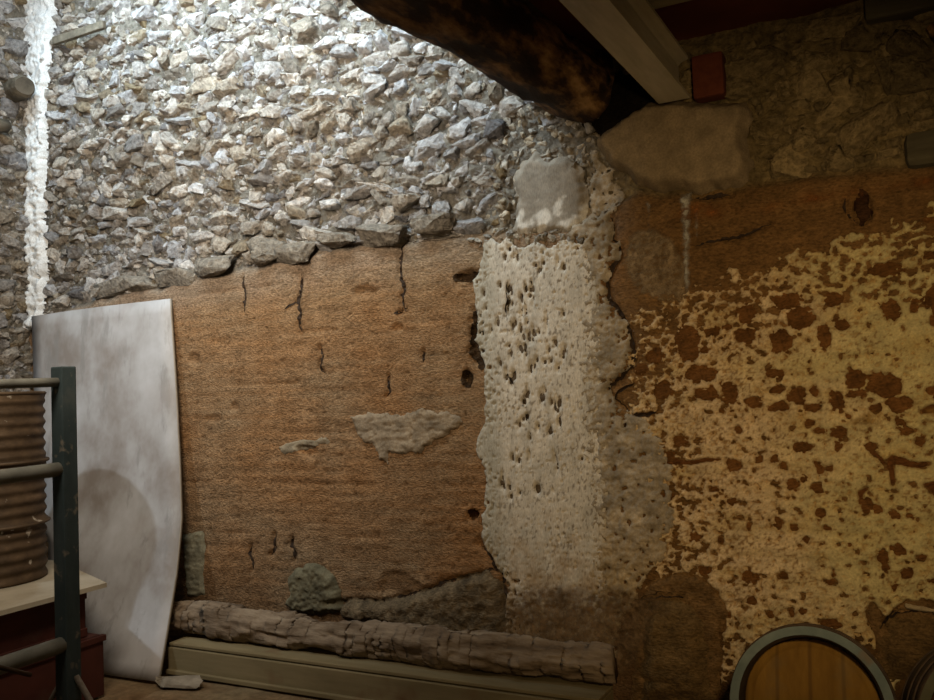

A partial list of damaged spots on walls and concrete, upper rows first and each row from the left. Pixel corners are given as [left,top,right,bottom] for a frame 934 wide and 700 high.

damp [627,193,691,301]
crack [696,224,771,246]
crack [394,236,460,314]
crack [285,274,303,331]
flaking render [881,284,934,326]
flaking render [674,292,934,453]
flaking render [664,436,743,472]
flaking render [755,454,833,493]
flaking render [864,442,928,484]
flaking render [858,488,915,520]
flaking render [877,542,927,572]
flaking render [866,599,934,682]